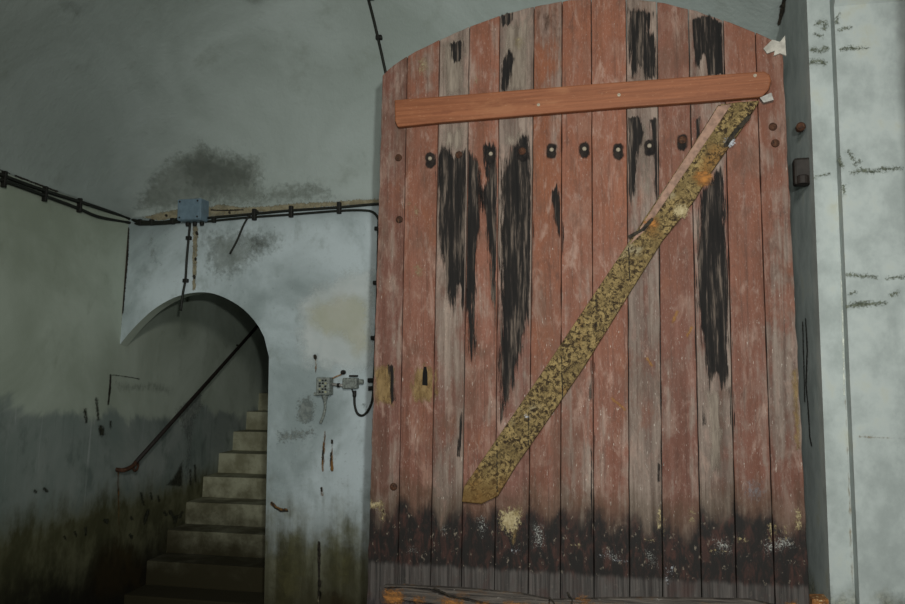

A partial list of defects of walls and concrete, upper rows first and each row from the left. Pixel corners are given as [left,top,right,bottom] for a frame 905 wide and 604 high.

damp [83,399,111,436]
corrosion [321,434,333,471]